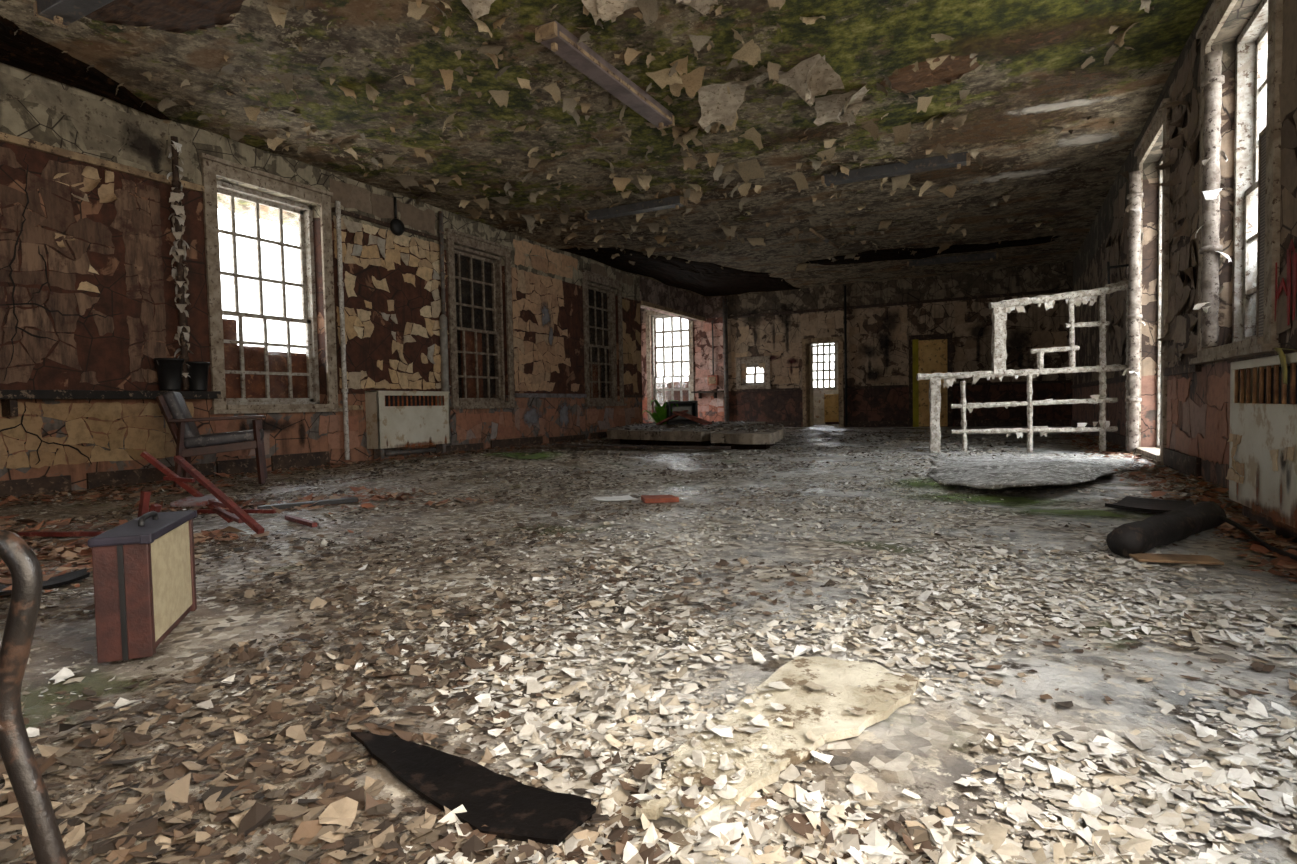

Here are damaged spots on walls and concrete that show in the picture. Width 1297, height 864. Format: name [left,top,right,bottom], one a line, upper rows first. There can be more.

peeling [1069,0,1155,74]
water stain [763,124,847,147]
peeling [0,0,1075,393]
peeling [695,307,908,412]
peeling [0,402,177,469]
peeling [319,415,360,450]
peeling [456,408,542,441]